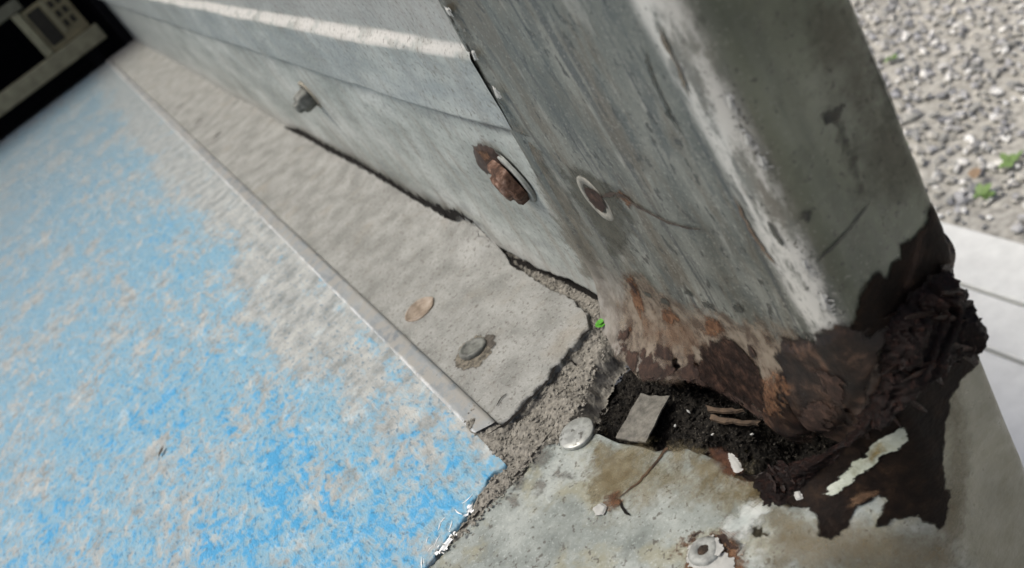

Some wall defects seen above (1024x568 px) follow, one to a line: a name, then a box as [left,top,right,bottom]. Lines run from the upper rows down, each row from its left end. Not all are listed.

rust [473,143,507,175]
peeling [794,240,836,316]
peeling [904,288,983,324]
rust [616,273,798,421]
peeling [826,416,908,496]
rust [670,531,748,568]